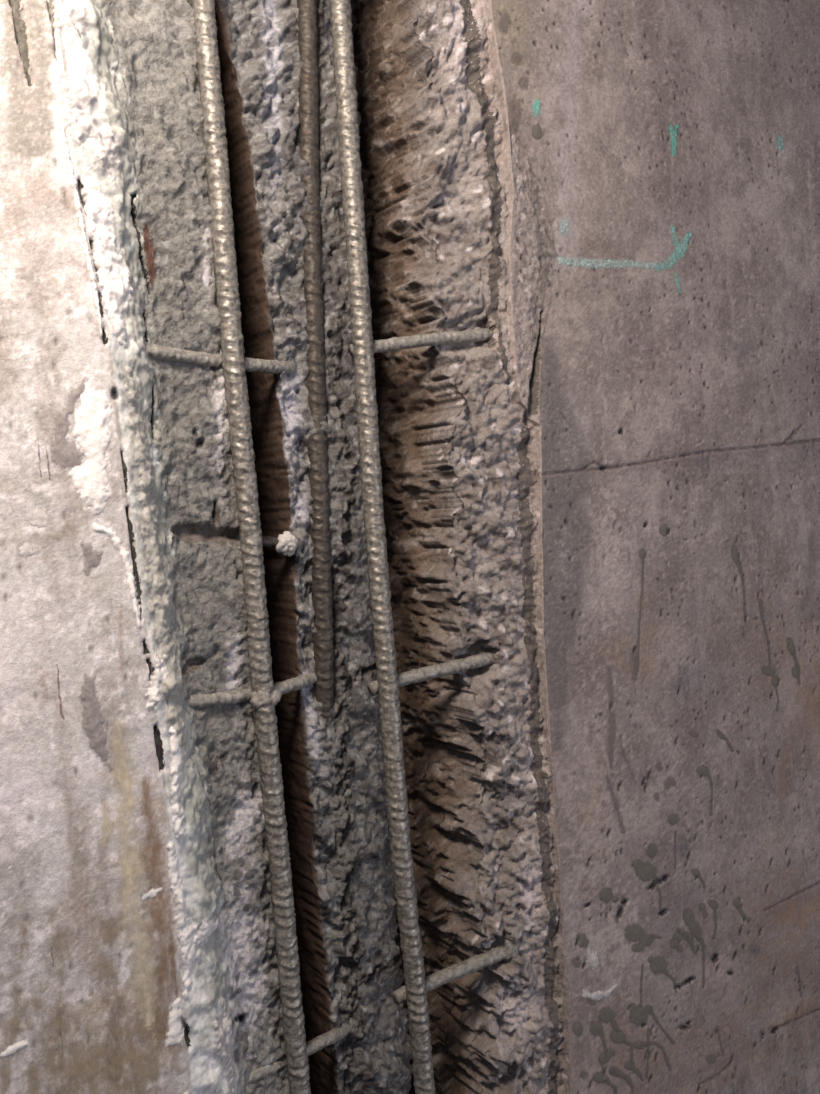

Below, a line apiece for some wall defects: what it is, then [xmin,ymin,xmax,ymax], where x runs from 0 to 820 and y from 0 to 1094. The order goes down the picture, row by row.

crack [9,0,81,86]
crack [77,180,108,344]
crack [130,194,150,342]
crack [148,387,156,439]
crack [121,451,155,681]
spalling [46,0,291,1094]
spalling [214,0,415,1094]
spalling [350,0,572,1094]
crack [459,0,820,1094]
crack [153,726,165,771]
crack [181,1018,191,1047]
peeling [582,984,617,1000]